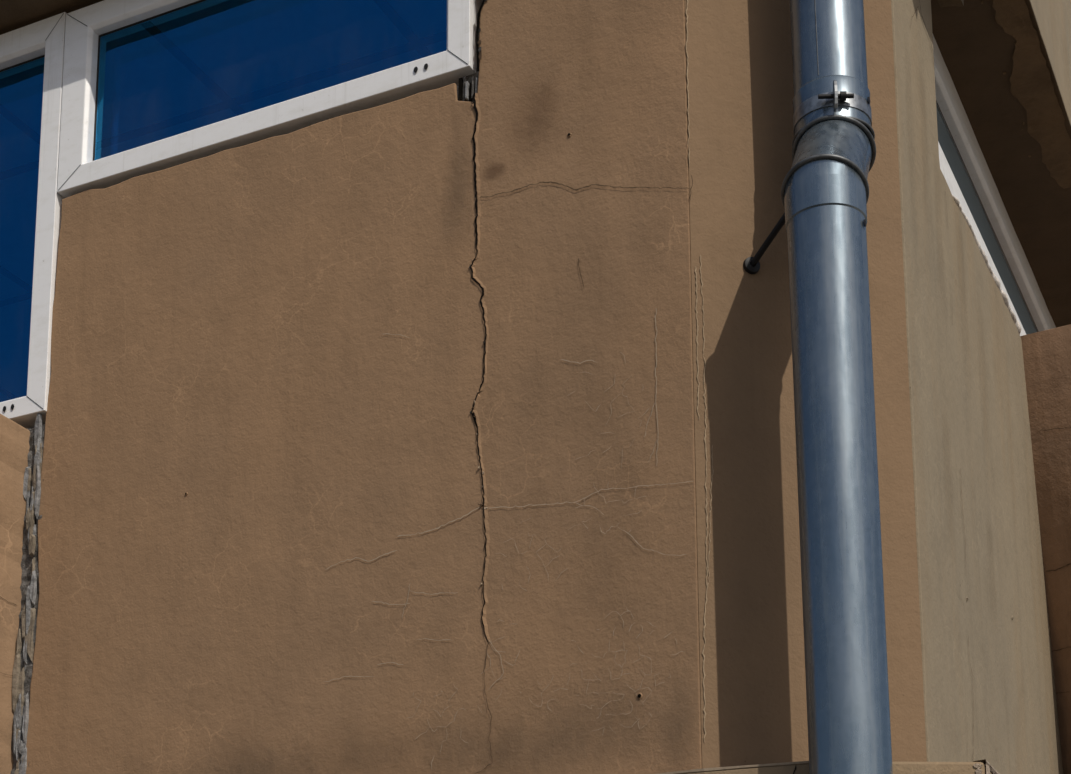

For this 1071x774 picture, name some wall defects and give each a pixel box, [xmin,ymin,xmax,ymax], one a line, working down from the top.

spalling [457,0,487,102]
crack [325,93,693,774]